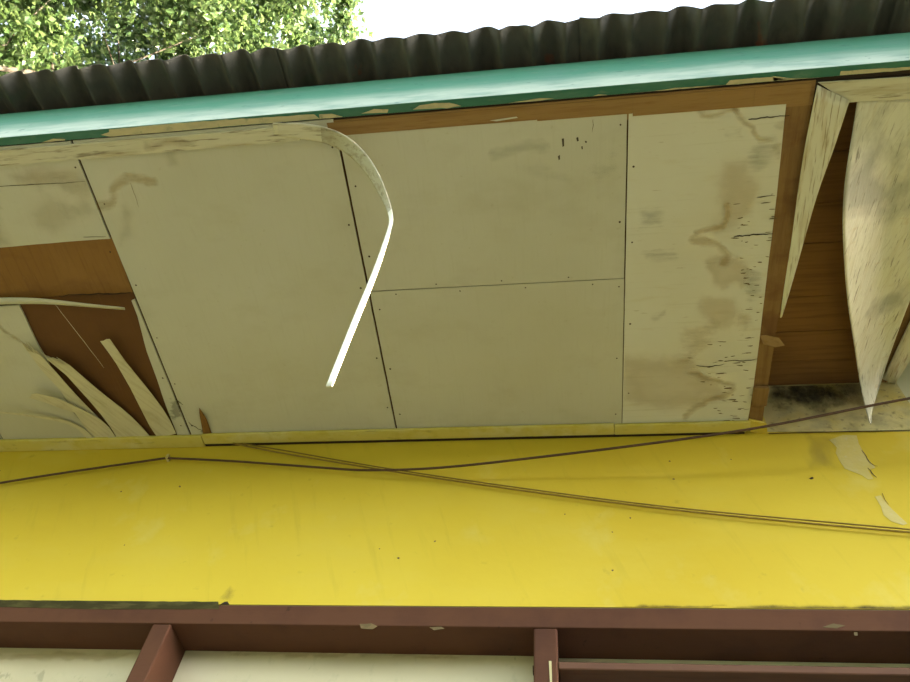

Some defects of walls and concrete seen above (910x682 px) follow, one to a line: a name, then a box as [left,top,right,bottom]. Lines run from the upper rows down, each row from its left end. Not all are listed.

peeling [840,67,910,75]
peeling [102,76,820,387]
peeling [0,236,191,438]
peeling [707,335,785,421]
leakage [774,384,856,405]
peeling [199,408,211,434]
spalling [830,435,876,480]
spalling [875,493,907,525]